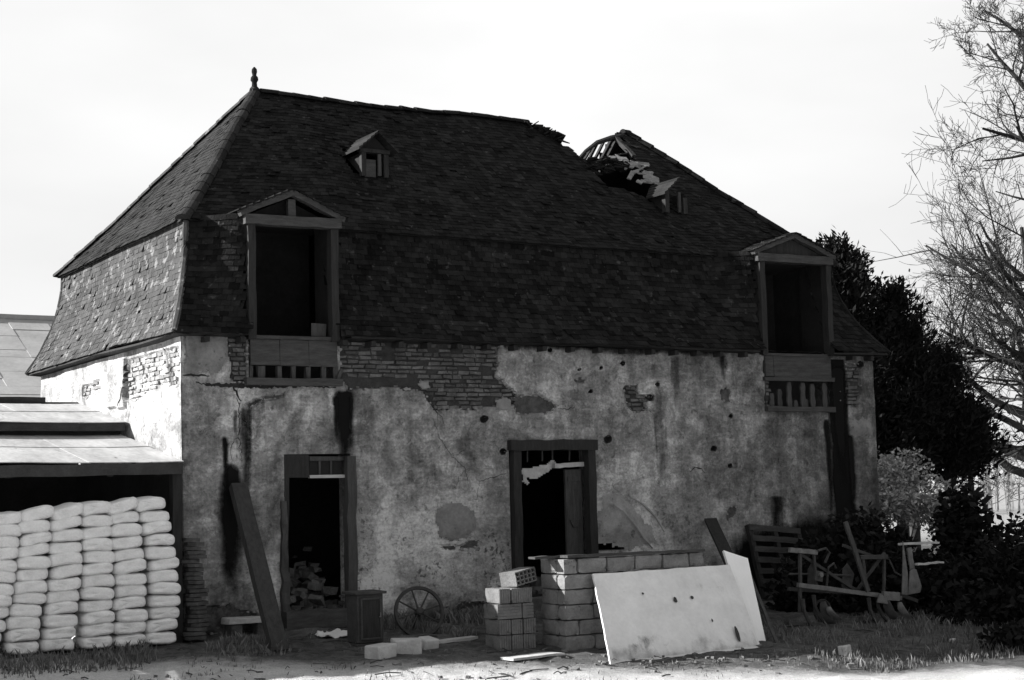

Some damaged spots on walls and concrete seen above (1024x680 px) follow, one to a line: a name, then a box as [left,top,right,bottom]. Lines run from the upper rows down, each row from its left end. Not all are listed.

flaking render [128,348,180,403]
flaking render [228,335,249,384]
damp [334,390,353,458]
flaking render [338,333,560,423]
flaking render [623,382,660,413]